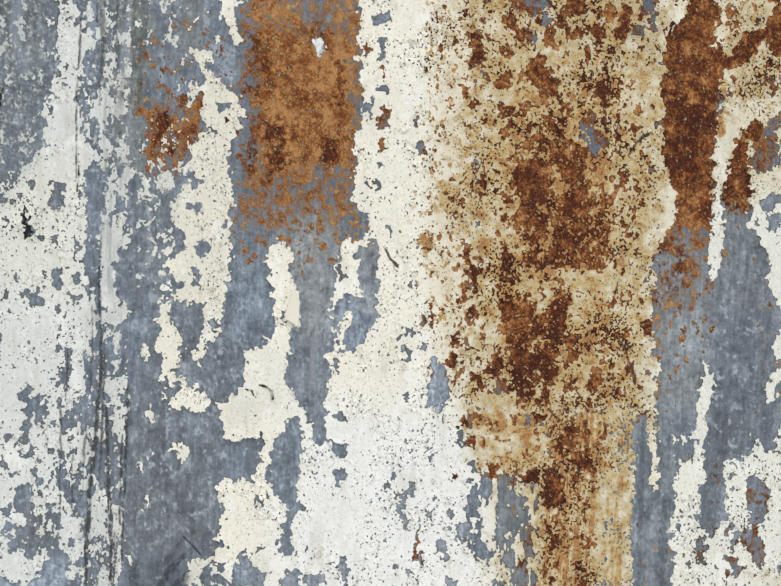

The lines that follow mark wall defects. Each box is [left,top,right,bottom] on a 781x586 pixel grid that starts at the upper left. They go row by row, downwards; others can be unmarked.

corrosion [130,0,377,277]
corrosion [375,105,392,152]
peeling [505,0,591,29]
peeling [508,101,614,161]
peeling [630,0,672,37]
peeling [0,0,553,586]
corrosion [411,0,781,586]
peeling [504,111,781,586]